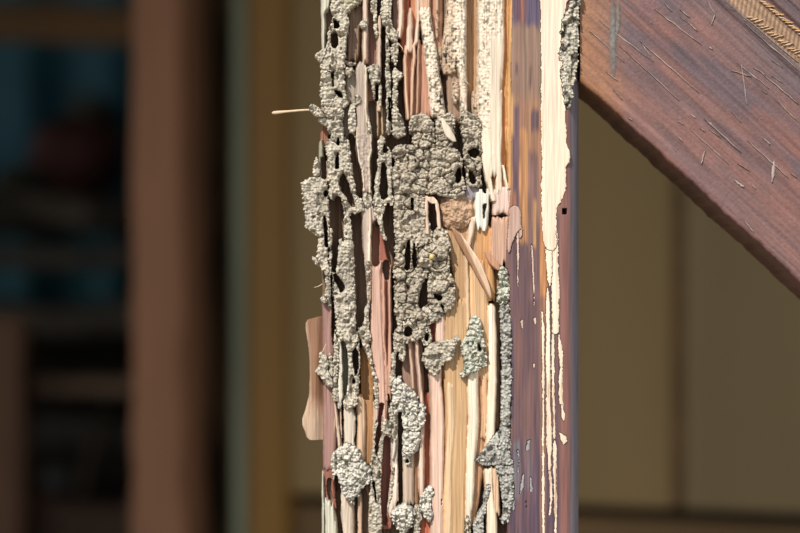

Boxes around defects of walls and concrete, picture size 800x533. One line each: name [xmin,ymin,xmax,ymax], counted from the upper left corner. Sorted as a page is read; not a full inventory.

peeling [507,205,523,253]
peeling [539,0,570,533]